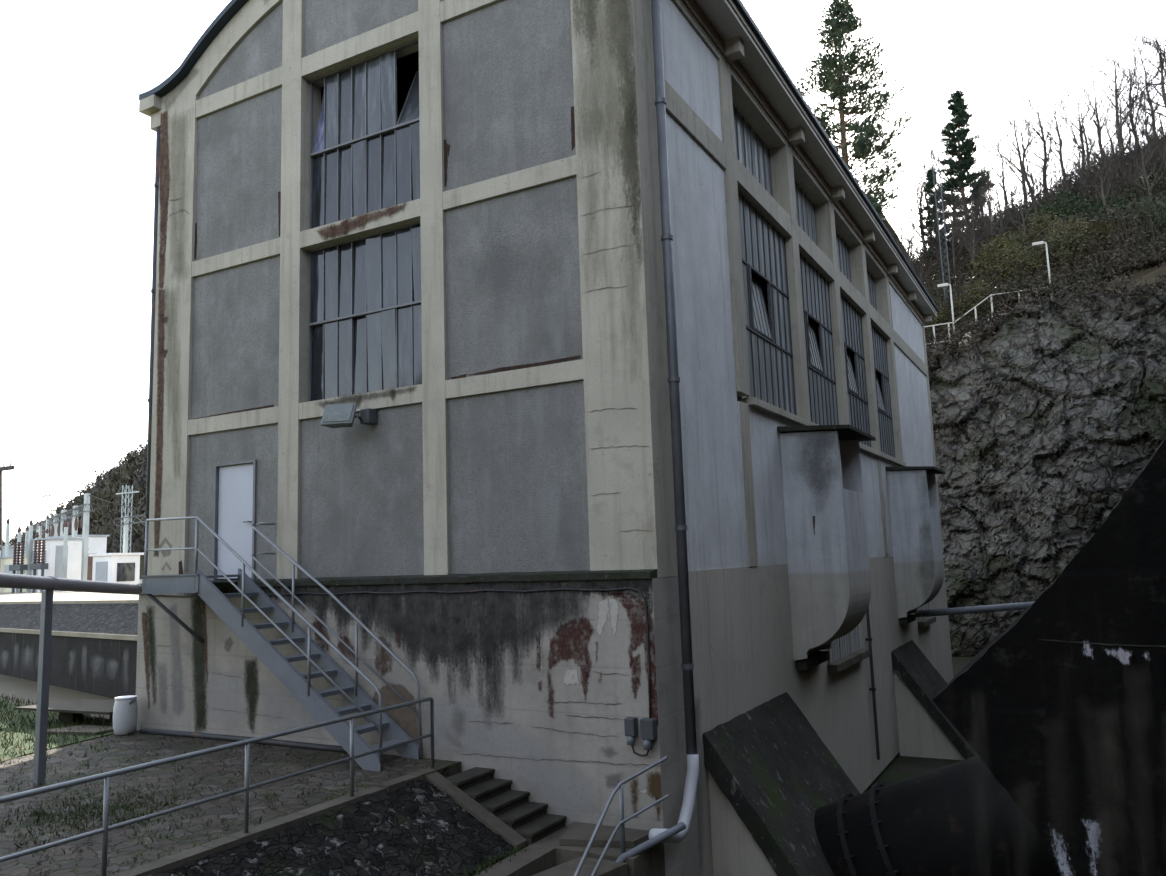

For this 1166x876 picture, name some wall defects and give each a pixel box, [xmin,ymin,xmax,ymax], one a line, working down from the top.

leakage [585,0,638,221]
corrosion [318,203,405,240]
corrosion [154,112,169,556]
leakage [147,593,206,730]
leakage [244,661,258,729]
leakage [260,579,653,709]
peeling [536,591,658,725]